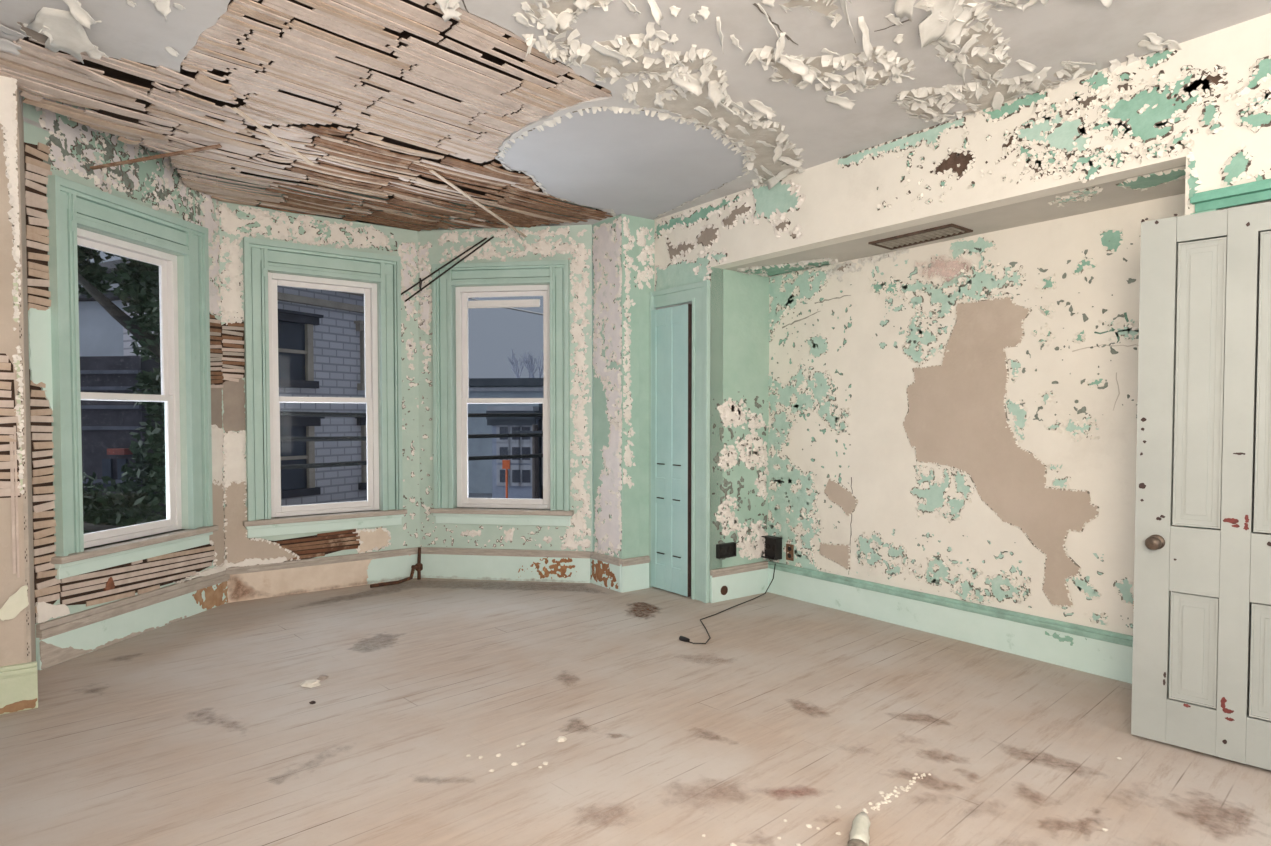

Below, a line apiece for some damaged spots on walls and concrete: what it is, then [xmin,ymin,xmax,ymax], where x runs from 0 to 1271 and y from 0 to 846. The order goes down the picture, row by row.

peeling [0,0,109,64]
peeling [0,76,53,495]
flaking render [35,0,1271,628]
rust [518,557,577,579]
rust [591,560,618,589]
peeling [0,585,70,623]
peeling [1045,631,1087,646]